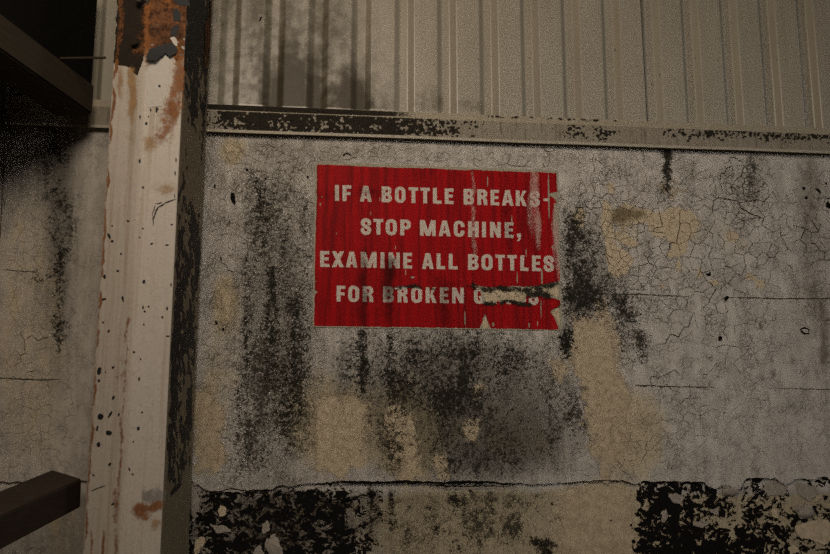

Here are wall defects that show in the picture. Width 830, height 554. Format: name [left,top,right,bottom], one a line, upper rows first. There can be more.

corrosion [109,0,136,143]
corrosion [132,0,187,148]
peeling [113,0,211,161]
peeling [600,180,699,278]
leakage [660,149,675,201]
peeling [143,166,230,501]
leakage [228,168,322,477]
leakage [333,202,648,484]
flaking render [194,536,206,554]
peeling [210,506,231,533]
leakage [233,488,558,554]
flaking render [788,520,830,554]